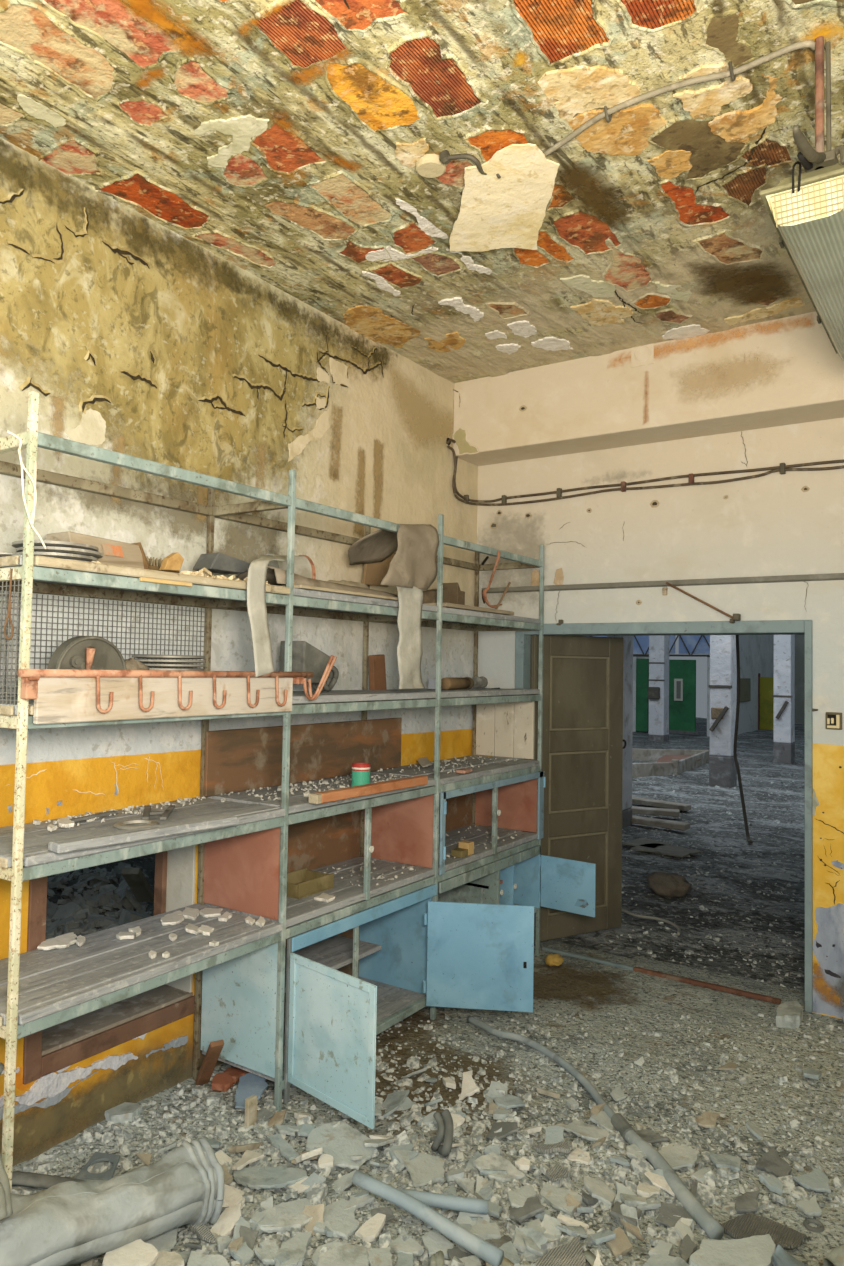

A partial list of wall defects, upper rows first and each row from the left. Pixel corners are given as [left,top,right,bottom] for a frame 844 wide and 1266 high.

crack [0,188,24,204]
crack [7,207,150,269]
spalling [0,0,489,289]
spalling [433,124,532,189]
spalling [512,182,693,326]
spalling [508,0,793,266]
crack [18,376,50,396]
crack [78,350,158,412]
damp [0,140,389,563]
crack [197,333,384,439]
peeling [812,902,844,1019]
peeling [0,1032,188,1120]